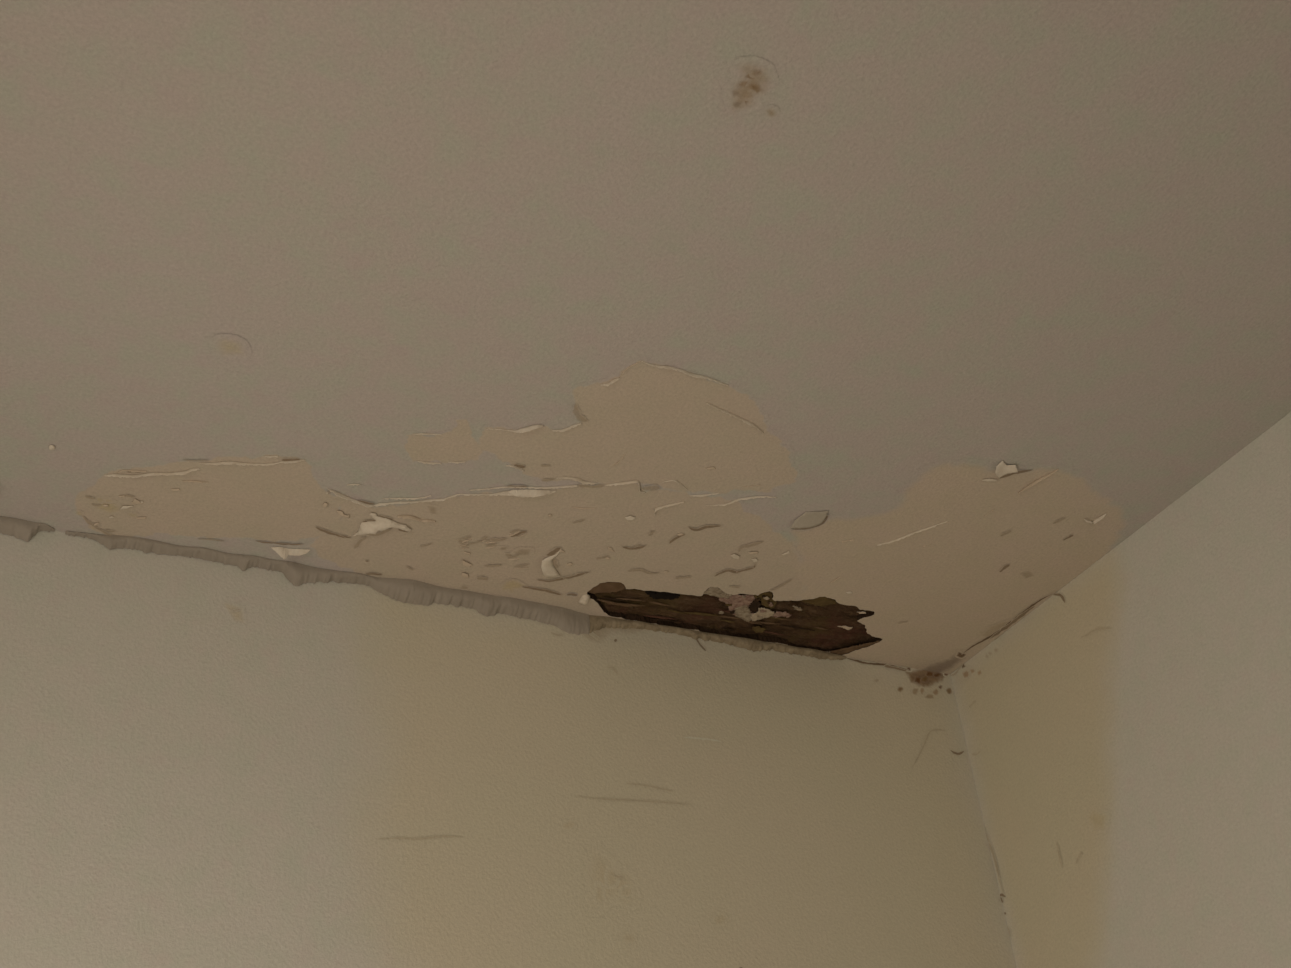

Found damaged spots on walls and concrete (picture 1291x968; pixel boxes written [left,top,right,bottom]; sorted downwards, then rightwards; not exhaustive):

peeling [271,430,1135,674]